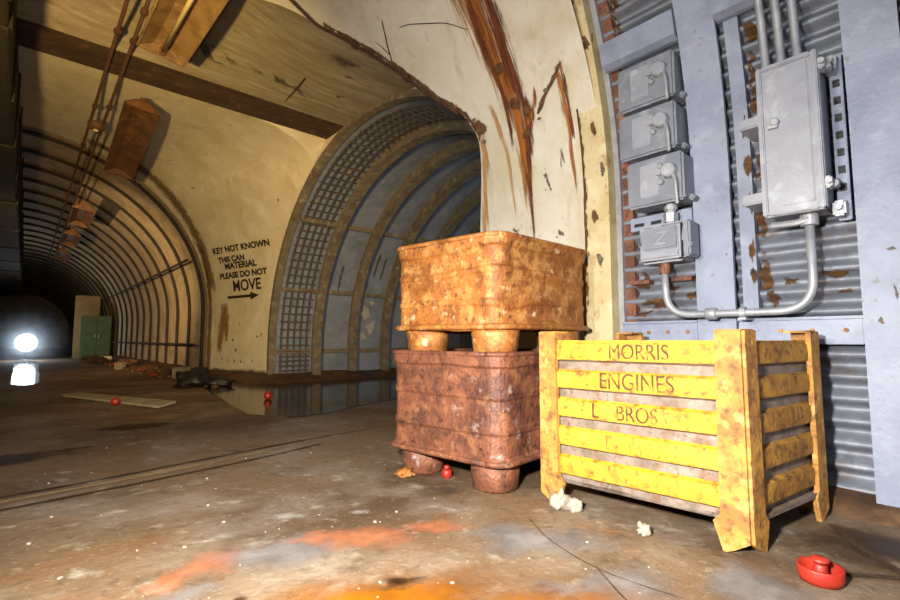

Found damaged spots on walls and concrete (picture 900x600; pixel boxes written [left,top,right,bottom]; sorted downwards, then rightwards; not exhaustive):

corrosion [453,0,537,238]
corrosion [555,62,577,189]
corrosion [743,22,758,120]
corrosion [743,150,761,181]
corrosion [749,210,781,308]
corrosion [822,269,851,278]